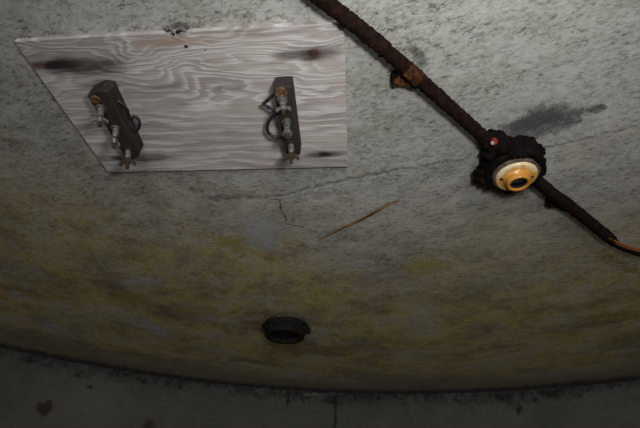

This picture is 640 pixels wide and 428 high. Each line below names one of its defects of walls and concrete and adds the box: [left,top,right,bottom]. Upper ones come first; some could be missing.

damp [494,91,607,141]
crack [273,171,397,228]
corrosion [319,200,398,240]
damp [18,346,633,415]